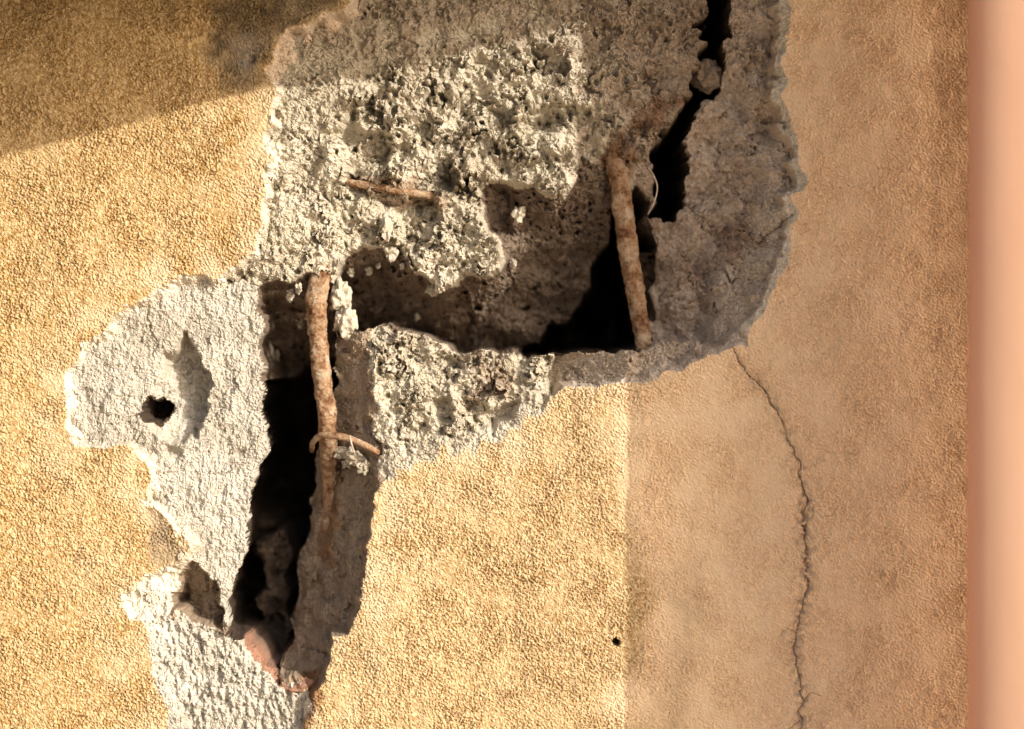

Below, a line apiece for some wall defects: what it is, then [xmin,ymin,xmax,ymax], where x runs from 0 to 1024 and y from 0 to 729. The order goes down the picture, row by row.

spalling [64,0,808,729]
crack [733,348,820,729]